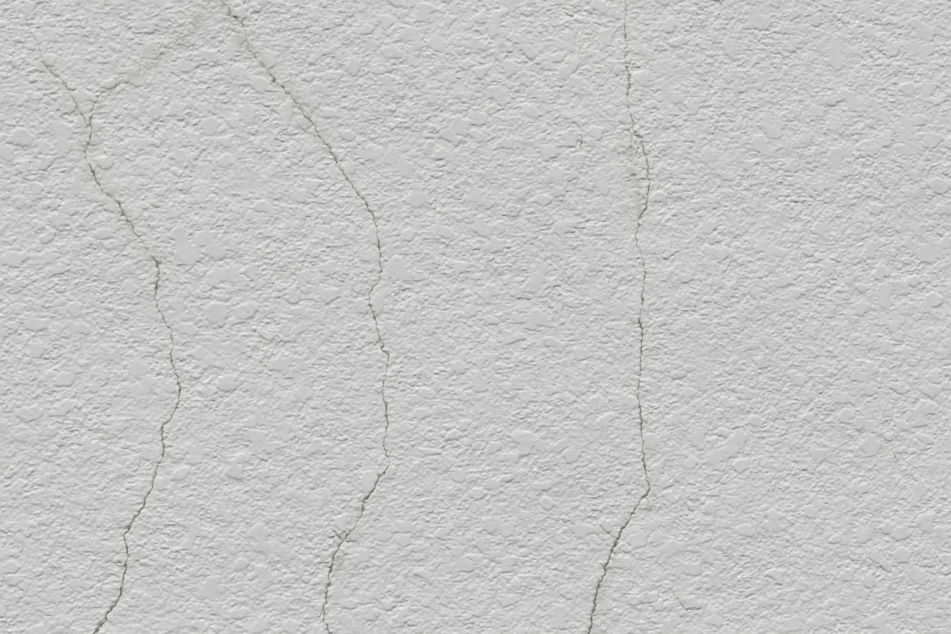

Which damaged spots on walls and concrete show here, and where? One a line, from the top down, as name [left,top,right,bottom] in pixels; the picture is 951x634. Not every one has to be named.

crack [86,89,181,634]
crack [312,122,389,633]
crack [588,164,651,634]